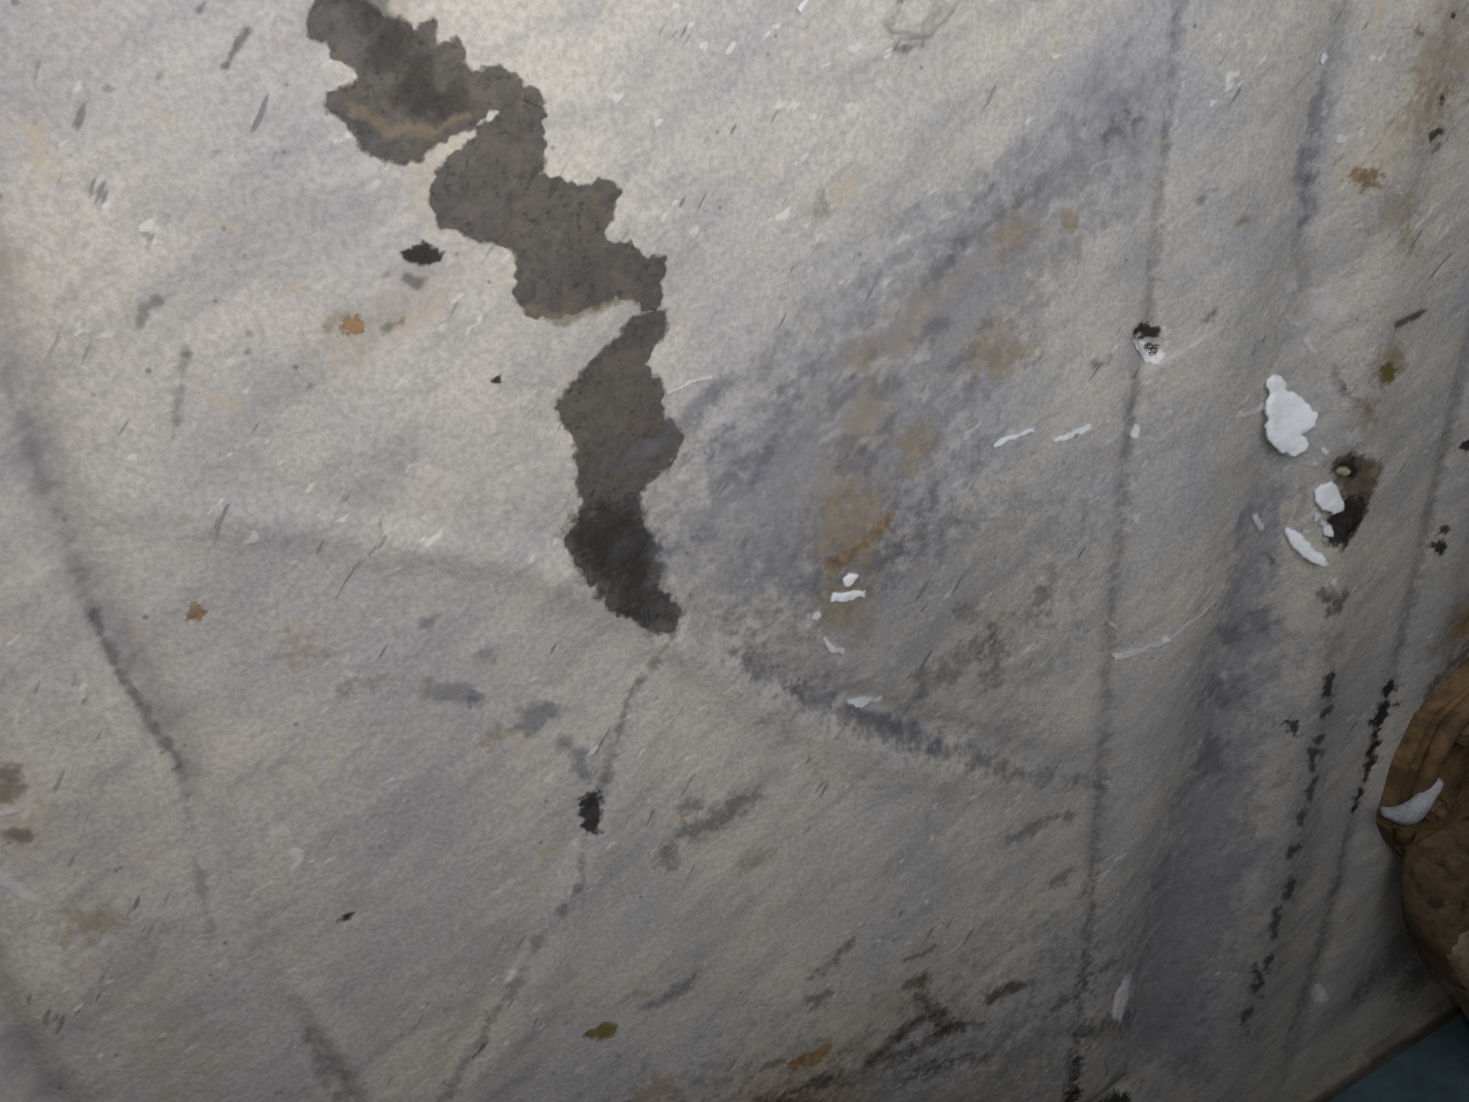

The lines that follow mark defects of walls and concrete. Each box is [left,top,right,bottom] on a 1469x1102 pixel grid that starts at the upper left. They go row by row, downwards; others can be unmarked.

water stain [307,0,684,634]
spalling [1133,323,1220,367]
peeling [1236,375,1382,586]
crack [578,791,603,834]